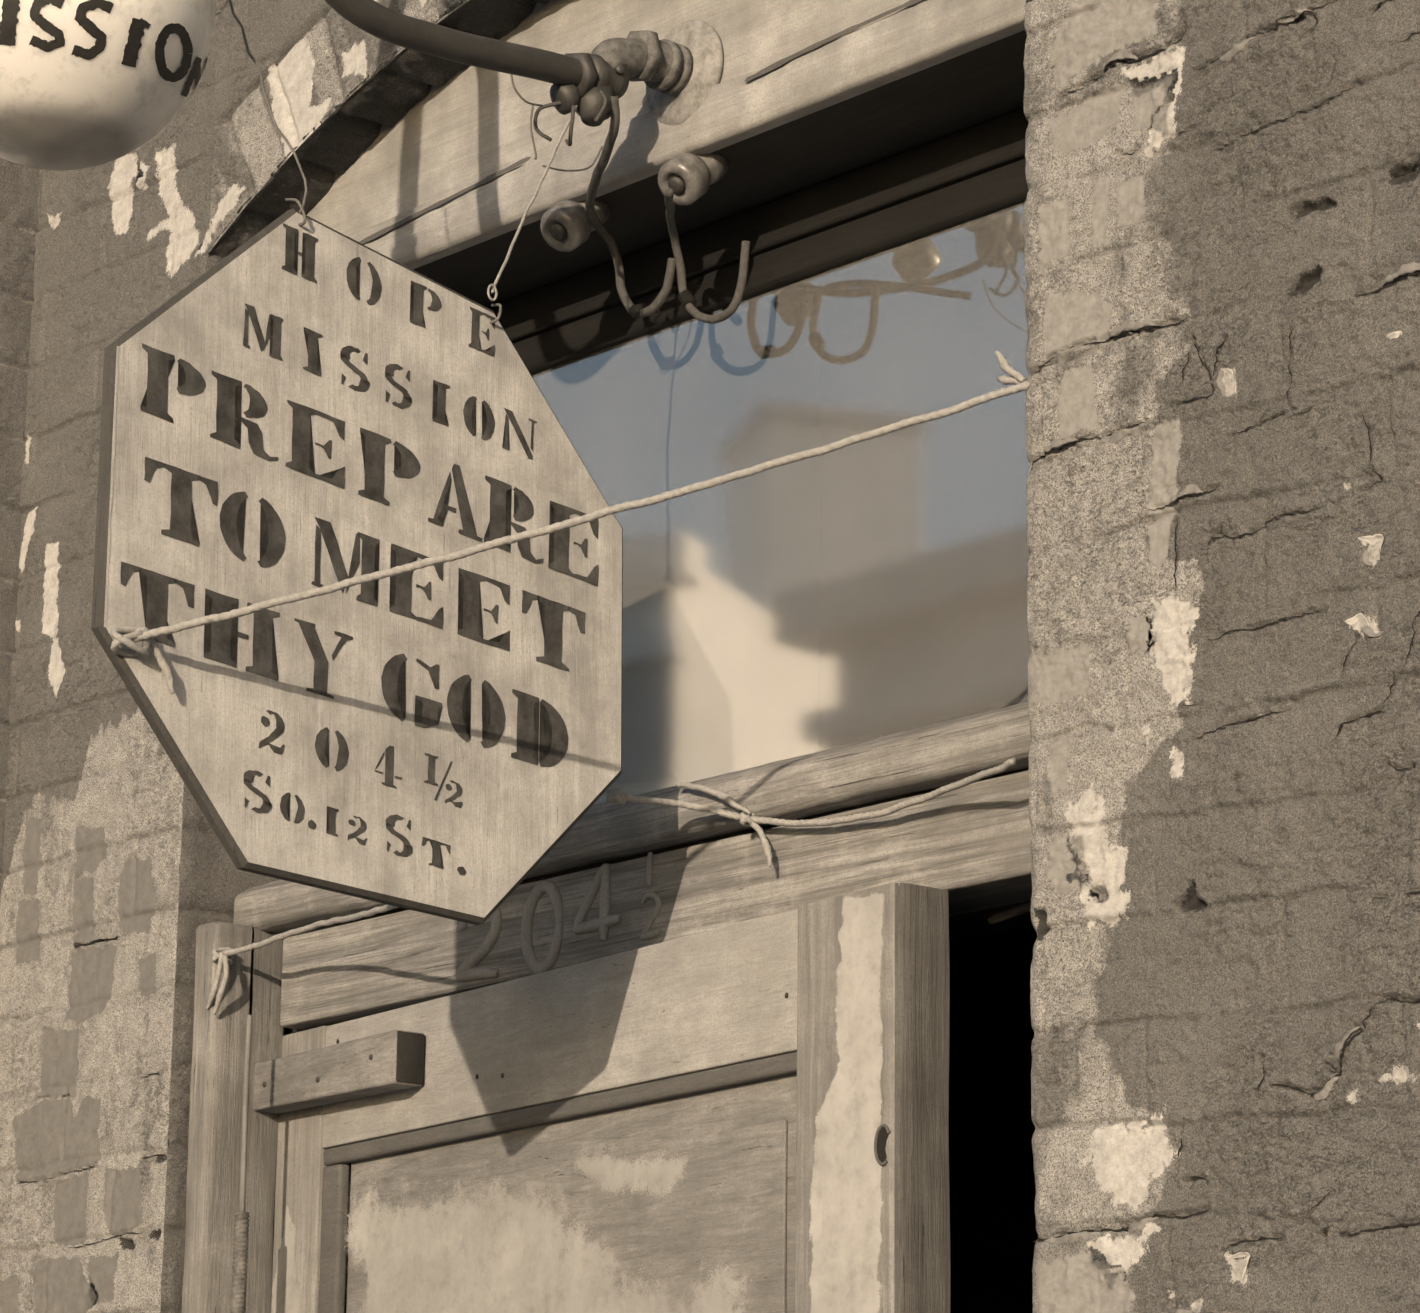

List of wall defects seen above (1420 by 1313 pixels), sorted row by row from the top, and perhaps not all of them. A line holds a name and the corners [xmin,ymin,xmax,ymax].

peeling [1046,0,1174,155]
peeling [1344,613,1384,639]
crack [1332,611,1420,741]
crack [1258,998,1420,1100]
peeling [1346,1089,1360,1108]
peeling [1378,1061,1420,1085]